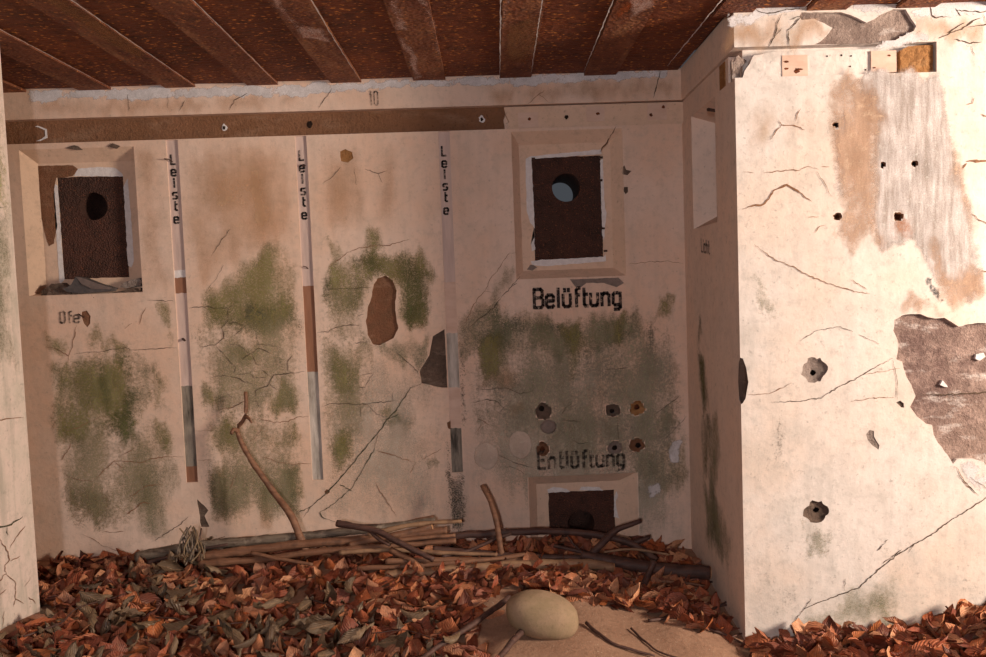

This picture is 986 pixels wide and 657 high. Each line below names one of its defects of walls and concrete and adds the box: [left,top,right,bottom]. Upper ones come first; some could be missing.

flaking render [728,1,986,46]
damp [833,69,984,305]
damp [118,393,135,443]
crack [49,230,439,522]
flaking render [366,276,398,345]
flaking render [420,330,447,387]
flaking render [893,314,986,464]
crack [0,518,36,623]
crack [62,444,177,553]
damp [446,450,466,532]
crack [795,466,986,621]